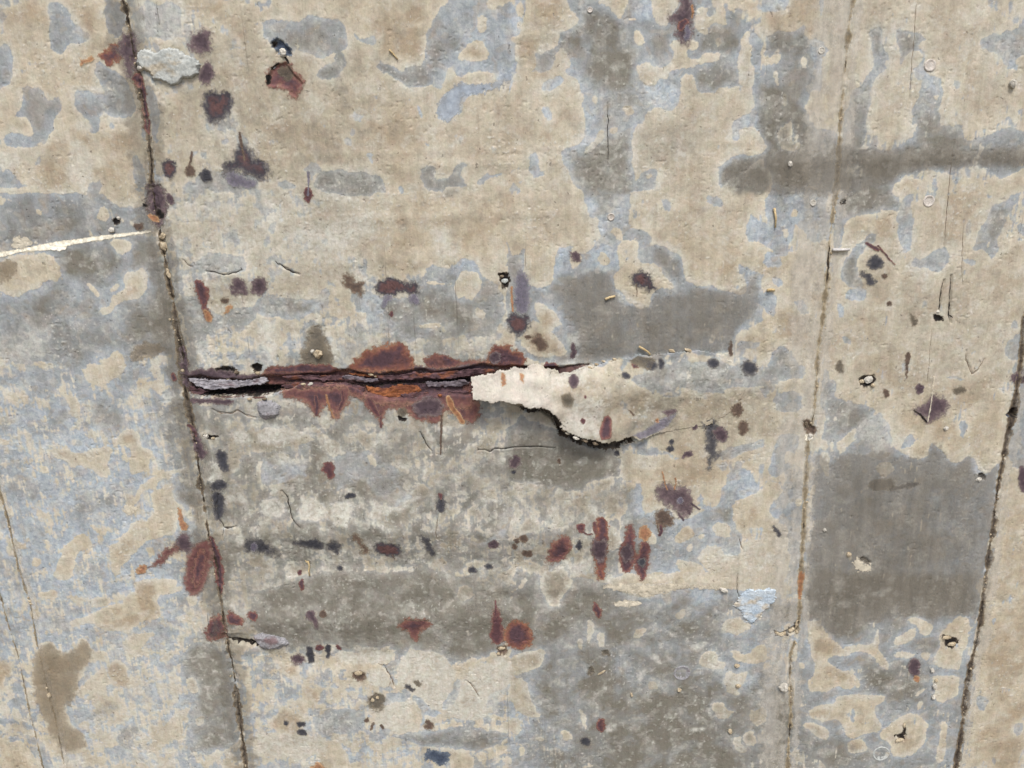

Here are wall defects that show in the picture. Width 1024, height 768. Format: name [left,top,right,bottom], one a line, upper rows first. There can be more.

rust [266,341,460,374]
rust [282,385,481,455]
crack [187,358,589,417]
peeling [471,348,745,445]
rust [905,352,951,424]
damp [869,478,919,491]
rust [135,508,225,596]
rust [546,471,701,581]
crack [227,635,264,649]
rust [489,600,534,650]